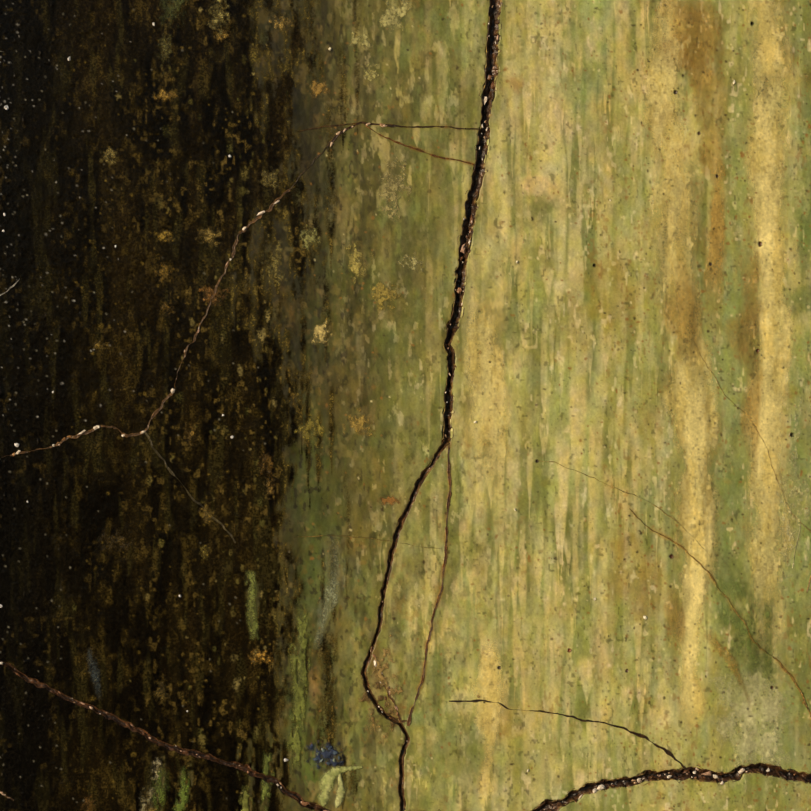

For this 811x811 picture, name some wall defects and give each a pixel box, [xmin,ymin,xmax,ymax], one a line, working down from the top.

damp [0,0,359,811]
crack [0,0,503,811]
crack [537,460,811,718]
crack [692,338,811,592]
crack [449,699,811,811]